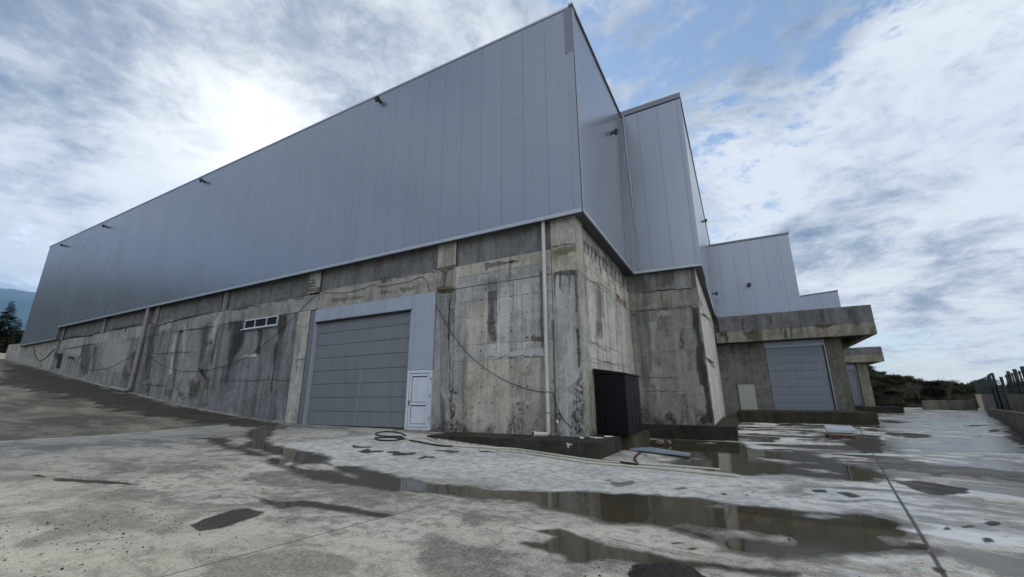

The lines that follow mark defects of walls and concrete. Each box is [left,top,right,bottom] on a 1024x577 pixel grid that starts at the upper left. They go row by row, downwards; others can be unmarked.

damp [160,320,187,374]
damp [572,329,585,433]
damp [666,307,713,423]